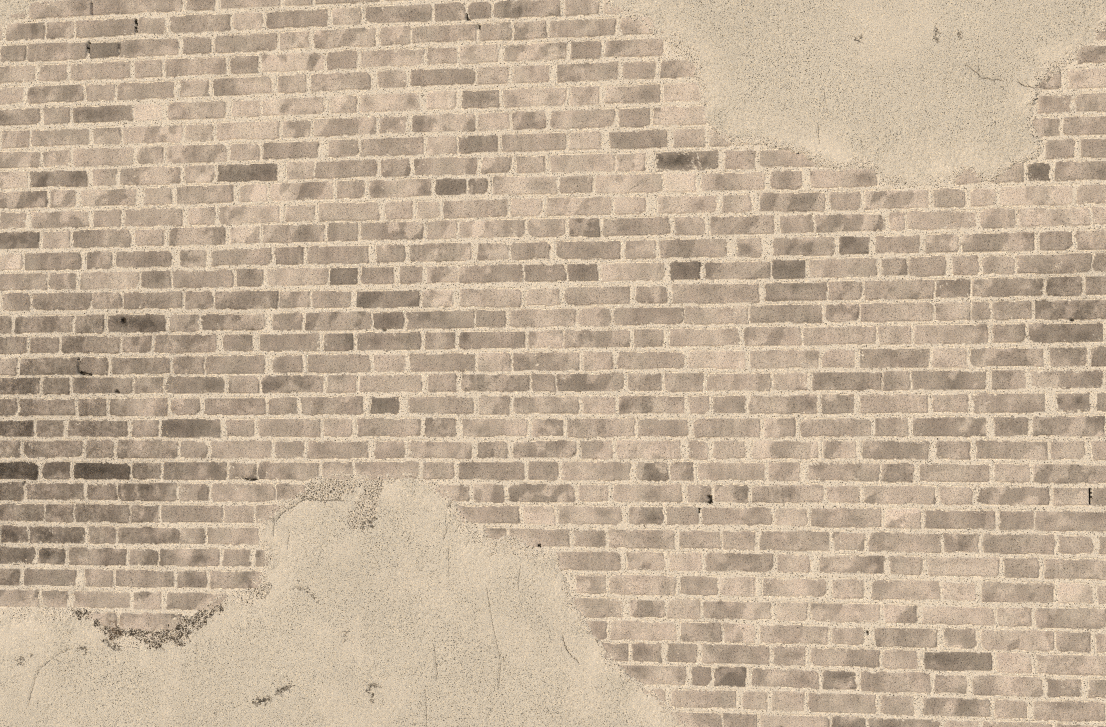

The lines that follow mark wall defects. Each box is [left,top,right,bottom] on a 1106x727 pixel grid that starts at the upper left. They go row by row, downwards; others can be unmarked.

flaking render [598,0,1106,188]
spalling [0,471,578,652]
spalling [252,681,295,707]